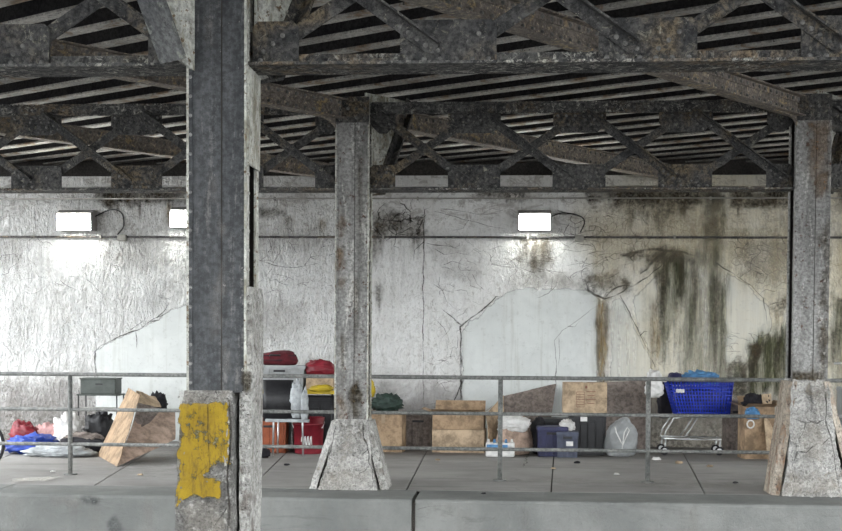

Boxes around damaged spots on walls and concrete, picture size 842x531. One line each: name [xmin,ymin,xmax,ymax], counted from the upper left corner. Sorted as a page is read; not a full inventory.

crack [113,296,171,342]
crack [373,199,688,404]
damp [584,186,785,394]
damp [832,306,842,362]
peeling [175,396,236,510]